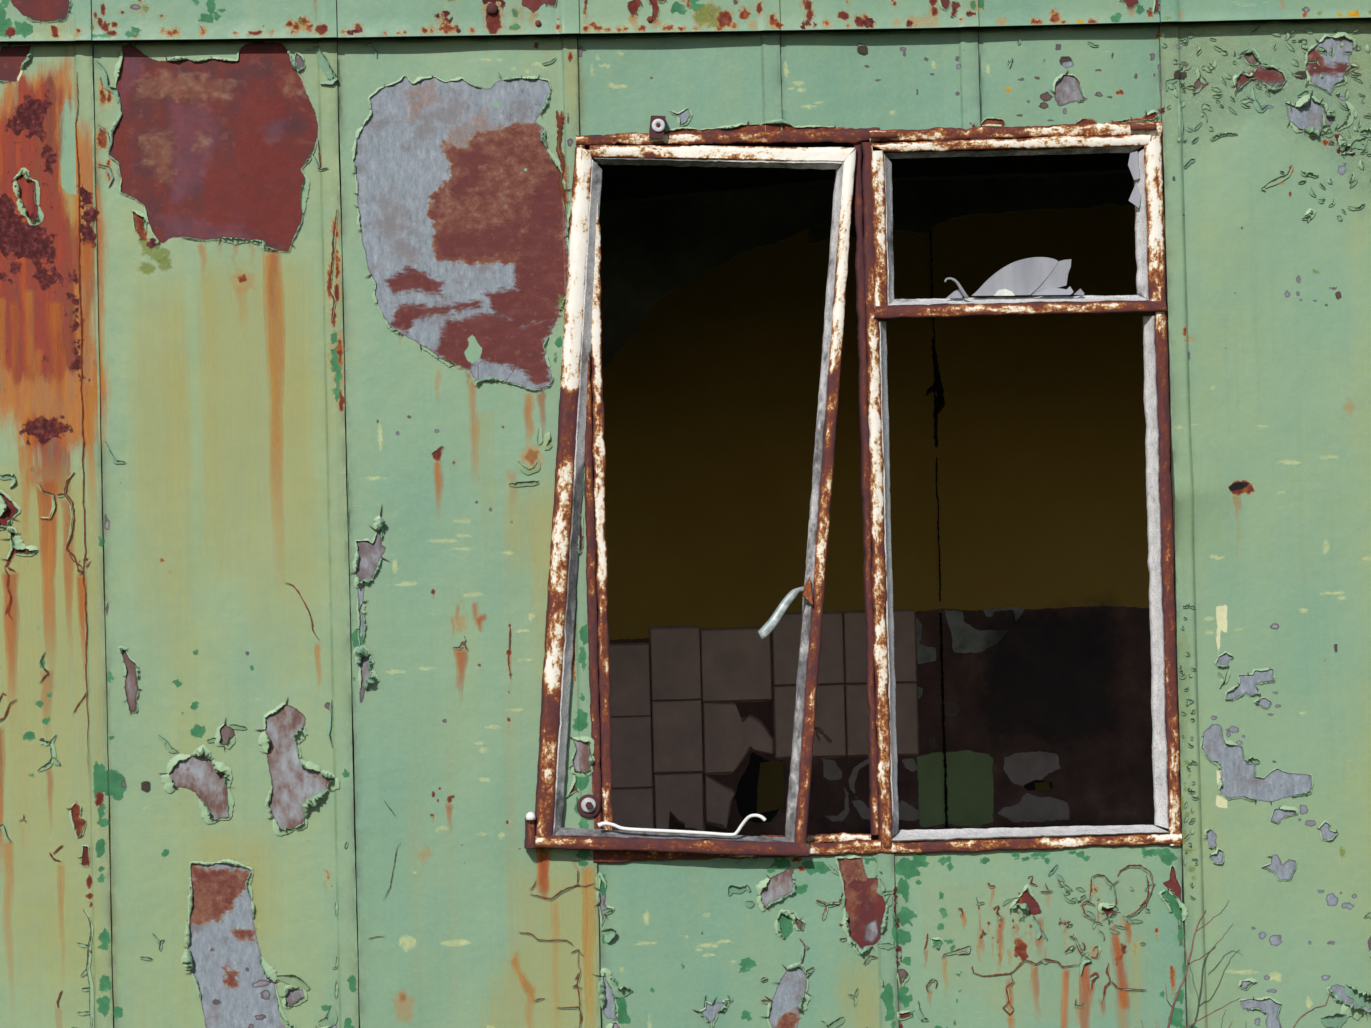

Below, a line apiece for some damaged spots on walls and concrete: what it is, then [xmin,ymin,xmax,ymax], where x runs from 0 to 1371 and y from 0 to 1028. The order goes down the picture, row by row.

rust [913,15,937,27]
peeling [327,74,574,447]
rust [0,54,106,755]
peeling [348,506,388,703]
rust [534,508,553,574]
peeling [159,701,235,824]
peeling [257,698,350,836]
peeling [733,700,773,737]
peeling [756,605,1345,1028]
peeling [181,859,355,1028]
rust [978,893,1049,964]
rust [1048,864,1155,1026]